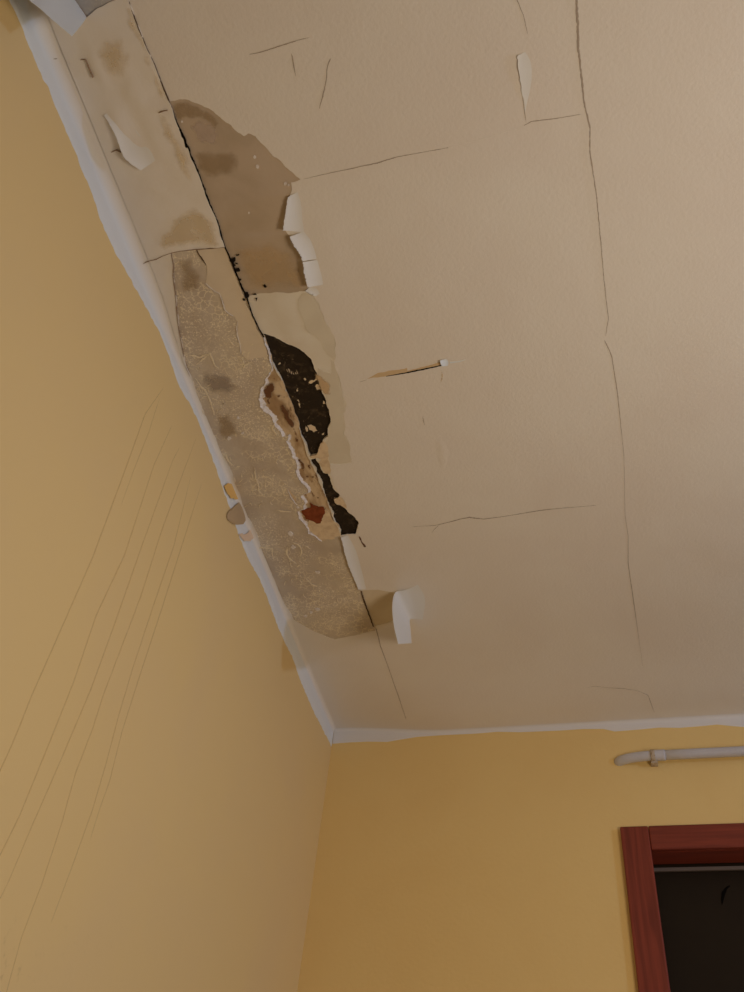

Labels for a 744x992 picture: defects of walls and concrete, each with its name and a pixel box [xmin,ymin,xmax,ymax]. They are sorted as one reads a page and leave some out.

peeling [30,0,113,36]
crack [129,2,264,338]
crack [565,0,608,338]
water stain [264,383,298,442]
peeling [143,99,425,644]
crack [368,359,464,379]